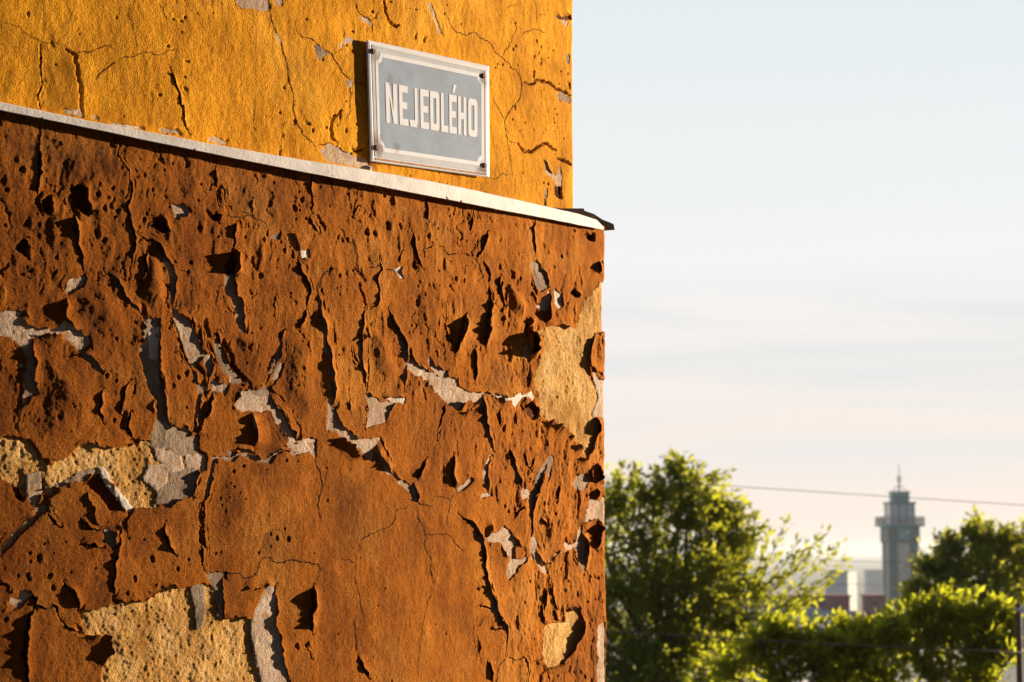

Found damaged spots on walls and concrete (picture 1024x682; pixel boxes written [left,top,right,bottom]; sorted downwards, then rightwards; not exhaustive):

peeling [234,0,282,17]
spalling [41,179,99,215]
spalling [153,196,192,233]
spalling [267,227,310,263]
peeling [319,140,368,176]
peeling [543,157,562,206]
spalling [584,226,595,241]
crack [0,0,585,682]
peeling [0,249,316,556]
peeling [316,260,606,630]
peeling [79,572,292,682]
peeling [542,596,605,682]